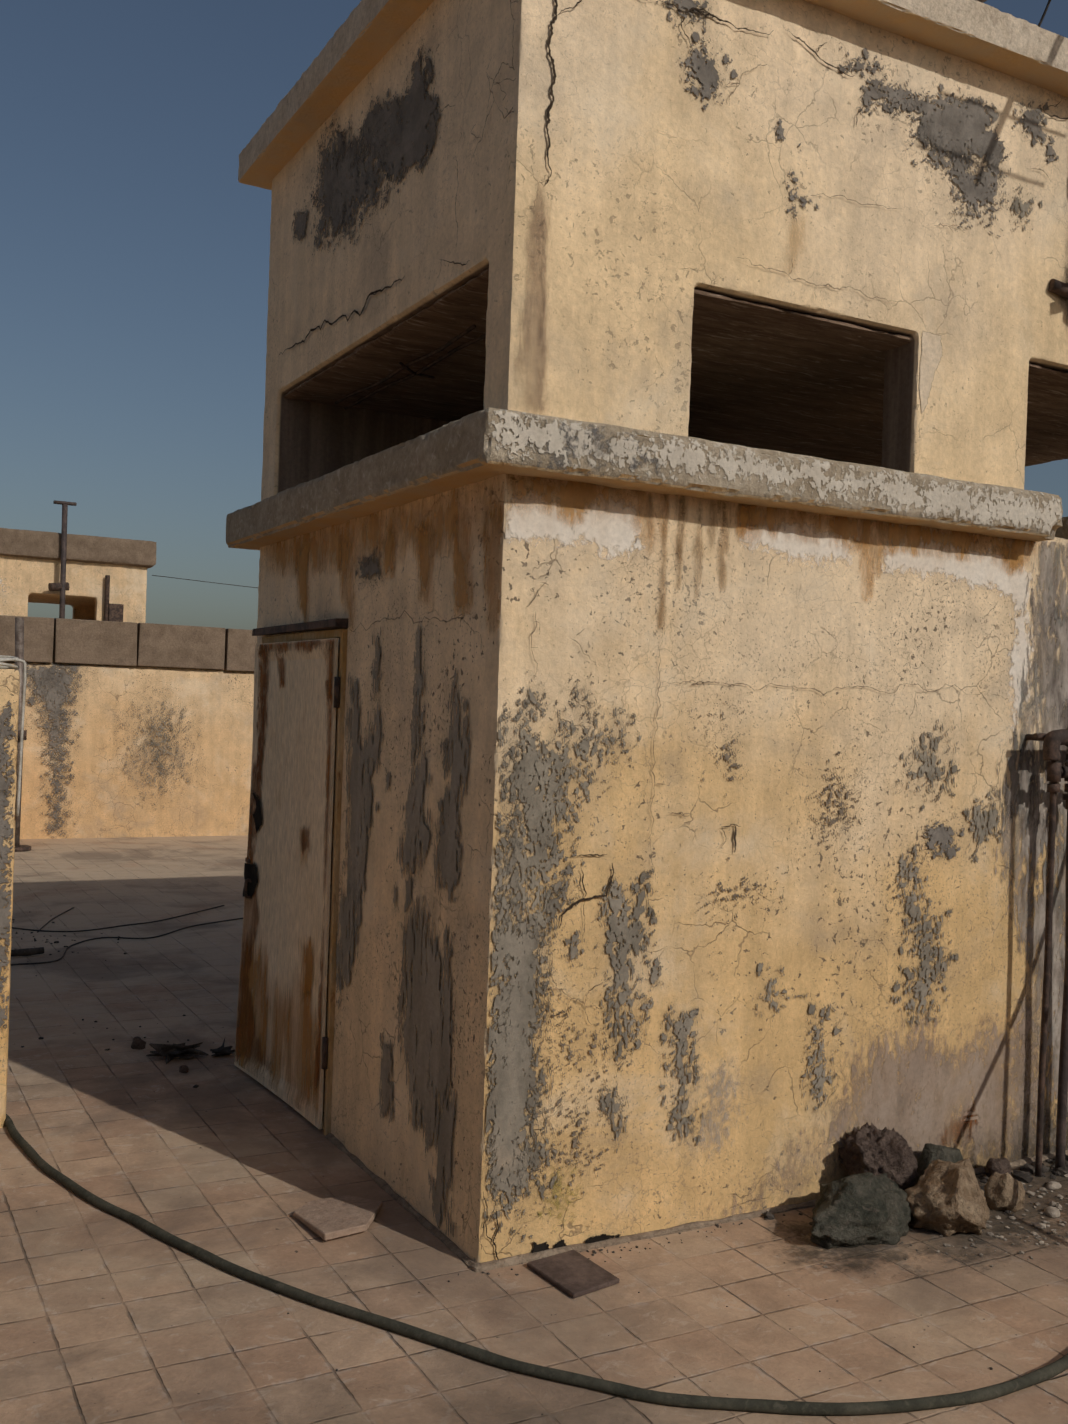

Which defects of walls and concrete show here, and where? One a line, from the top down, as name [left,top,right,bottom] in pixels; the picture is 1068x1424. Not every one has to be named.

crack [435,0,582,266]
crack [661,1,864,124]
peeling [839,43,1059,237]
crack [279,276,405,355]
peeling [488,409,1062,535]
peeling [0,662,89,1029]
rust [246,639,334,882]
peeling [378,625,470,1237]
peeling [484,670,704,1253]
water stain [723,504,1068,1246]
peeling [795,715,1004,1031]
water stain [777,1224,908,1269]